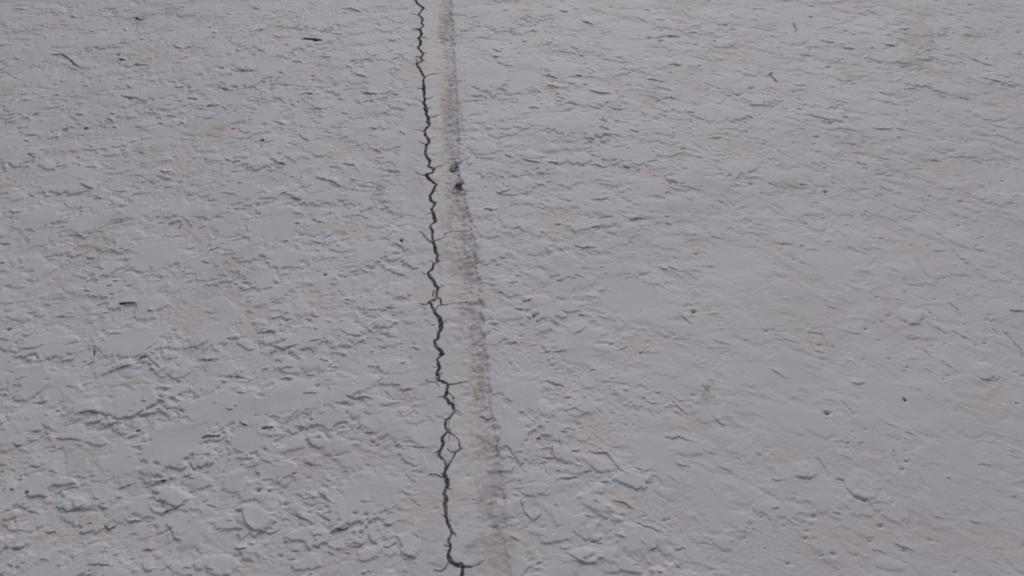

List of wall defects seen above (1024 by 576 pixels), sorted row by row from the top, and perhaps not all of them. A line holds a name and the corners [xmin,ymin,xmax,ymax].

crack [410,0,484,576]